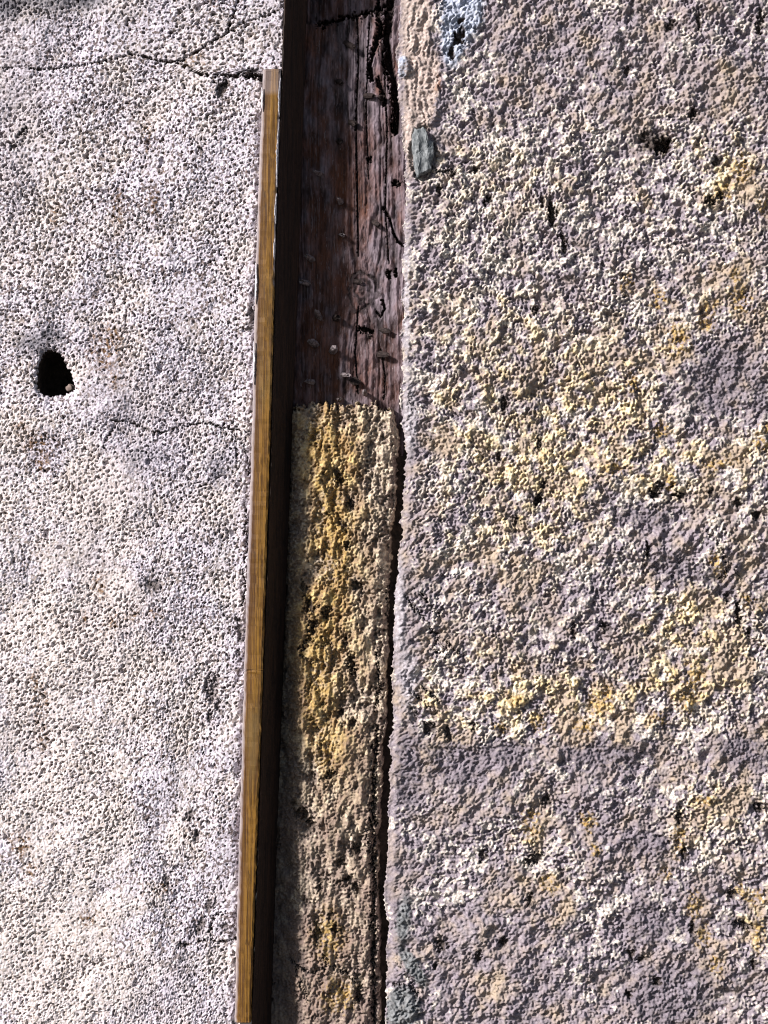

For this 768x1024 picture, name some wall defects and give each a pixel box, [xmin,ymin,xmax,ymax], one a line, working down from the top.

crack [7,0,280,79]